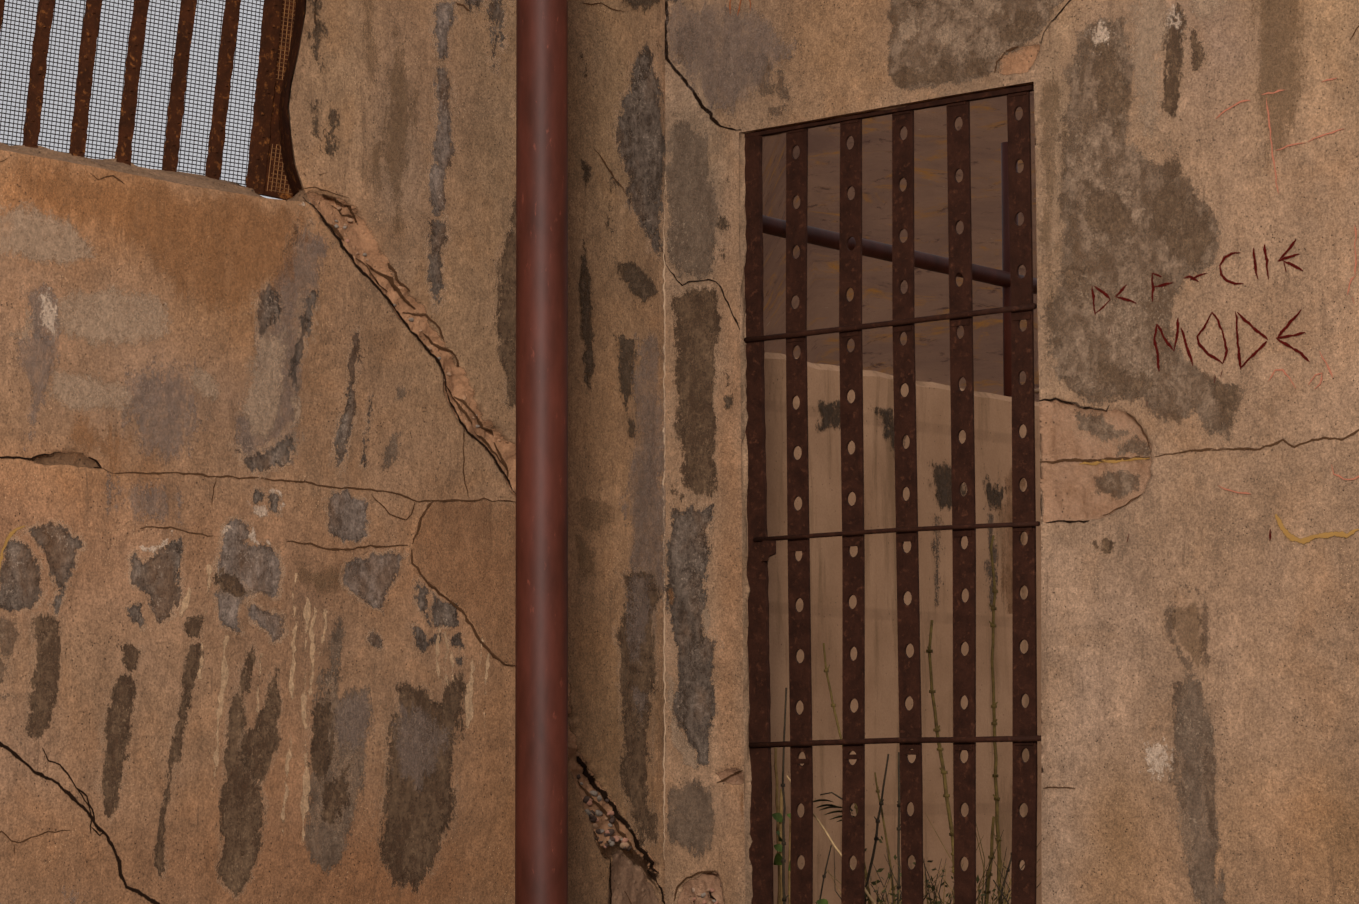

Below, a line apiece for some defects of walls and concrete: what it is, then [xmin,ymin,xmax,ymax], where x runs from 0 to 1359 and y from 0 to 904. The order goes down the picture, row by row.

crack [665,0,741,130]
spalling [994,45,1040,75]
crack [103,429,515,551]
spalling [303,192,516,496]
leakage [605,0,797,865]
crack [1155,429,1359,457]
leakage [0,520,86,744]
crack [0,742,160,904]
leakage [123,517,374,897]
leakage [378,579,490,893]
spalling [568,683,724,904]
spalling [716,768,744,785]